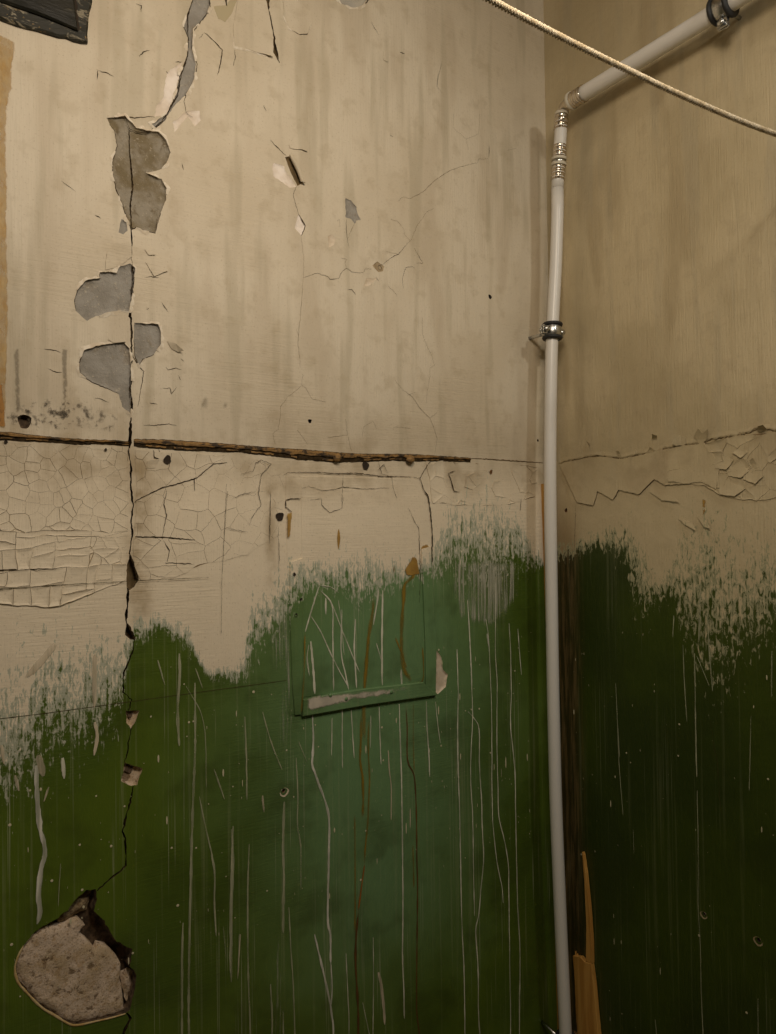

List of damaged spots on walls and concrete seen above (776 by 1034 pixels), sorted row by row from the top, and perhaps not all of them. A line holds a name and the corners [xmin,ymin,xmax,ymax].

spalling [107,0,280,235]
peeling [272,154,305,188]
peeling [295,215,306,235]
peeling [345,198,361,224]
spalling [74,264,184,417]
crack [0,0,539,763]
peeling [559,423,776,505]
spalling [126,710,139,728]
spalling [121,763,142,786]
crack [97,786,134,891]
spalling [14,889,136,1026]